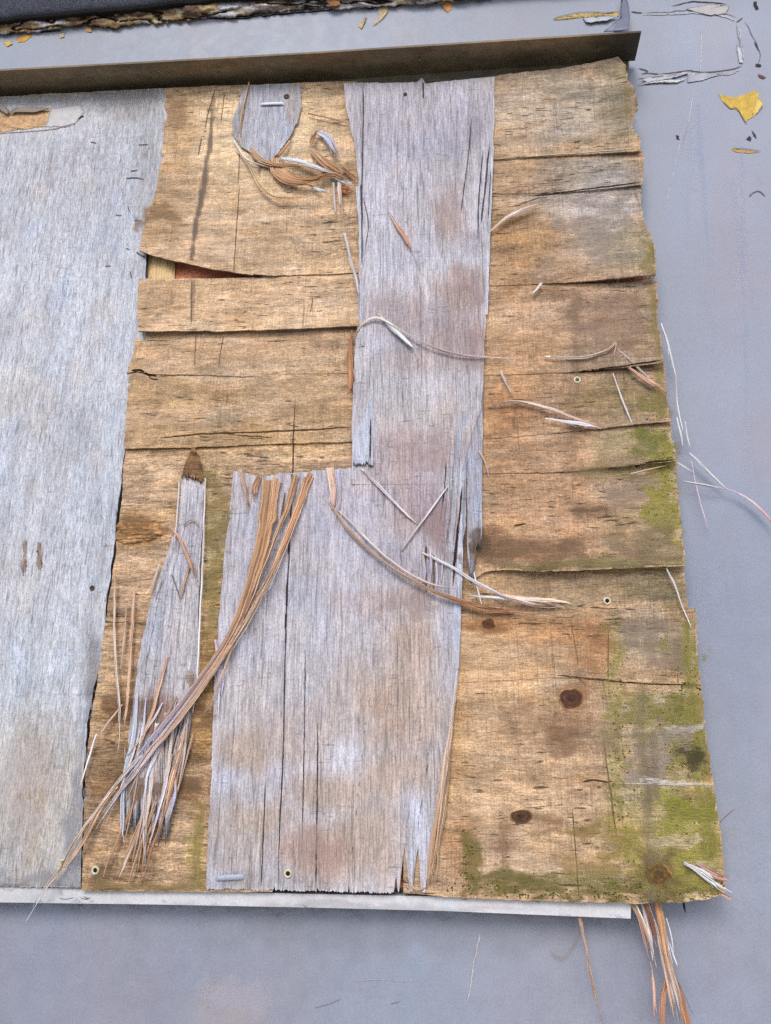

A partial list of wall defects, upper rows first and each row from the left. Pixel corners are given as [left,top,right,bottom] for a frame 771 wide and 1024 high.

crack [461,118,642,232]
crack [160,398,345,479]
crack [261,504,318,880]
crack [557,618,698,686]
water stain [665,724,704,733]
crack [583,738,713,838]
water stain [639,776,702,786]
crack [571,807,579,892]
water stain [648,834,707,850]